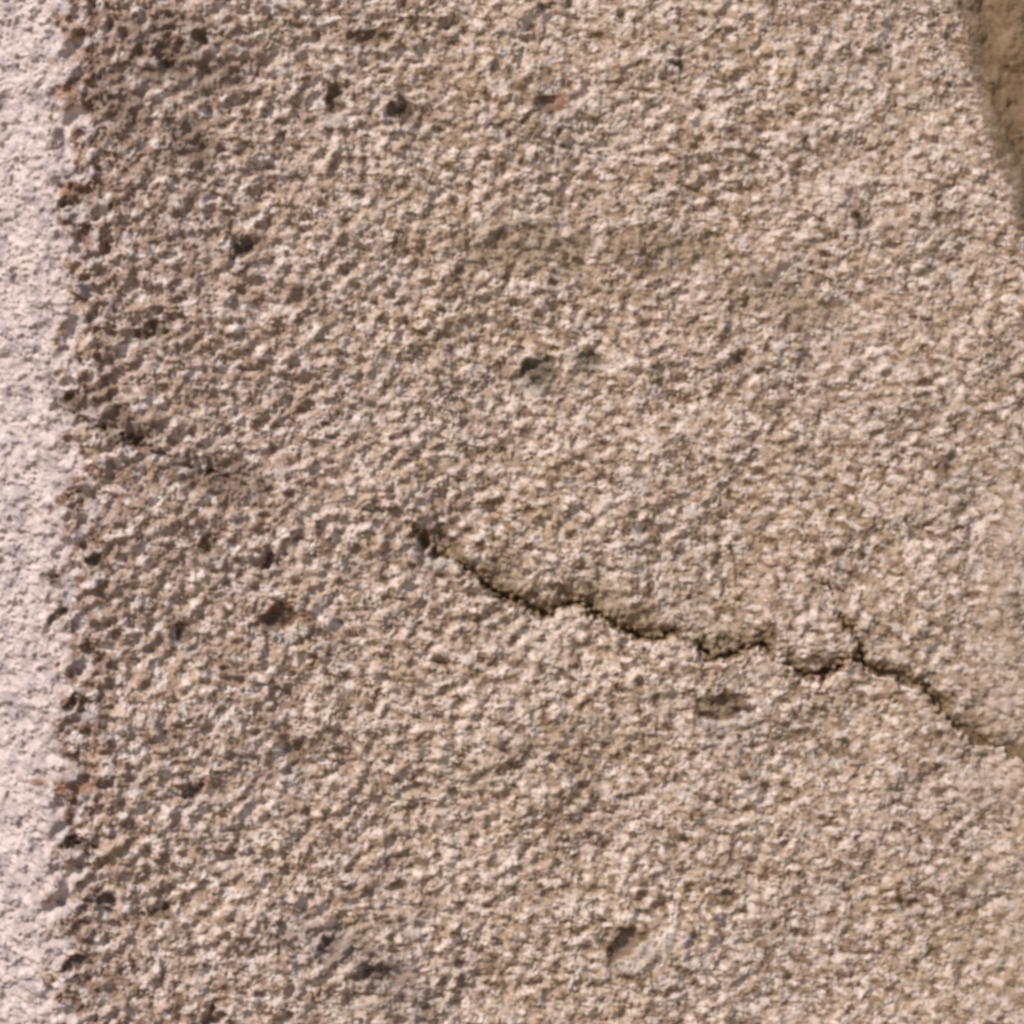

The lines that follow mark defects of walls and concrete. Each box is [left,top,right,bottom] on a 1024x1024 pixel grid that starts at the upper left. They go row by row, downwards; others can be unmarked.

crack [415,529,1023,759]